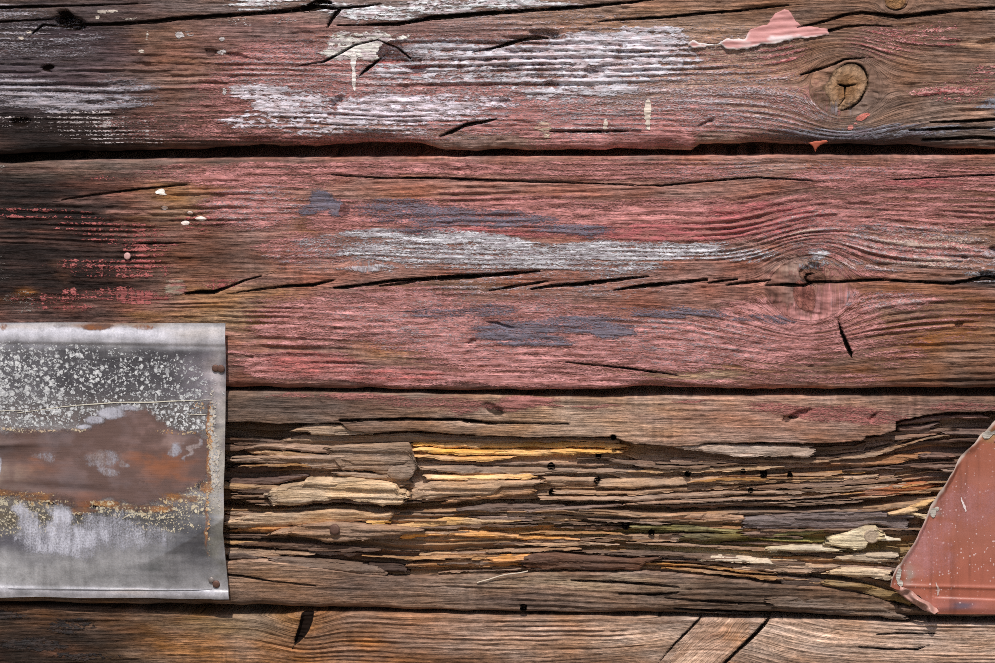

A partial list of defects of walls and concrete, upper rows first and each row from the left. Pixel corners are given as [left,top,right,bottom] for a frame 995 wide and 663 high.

crack [0,0,995,79]
crack [801,58,868,112]
peeling [90,0,995,417]
peeling [0,204,178,311]
crack [178,271,995,295]
corrosion [0,341,225,545]
peeling [751,403,911,426]
crack [573,580,839,663]